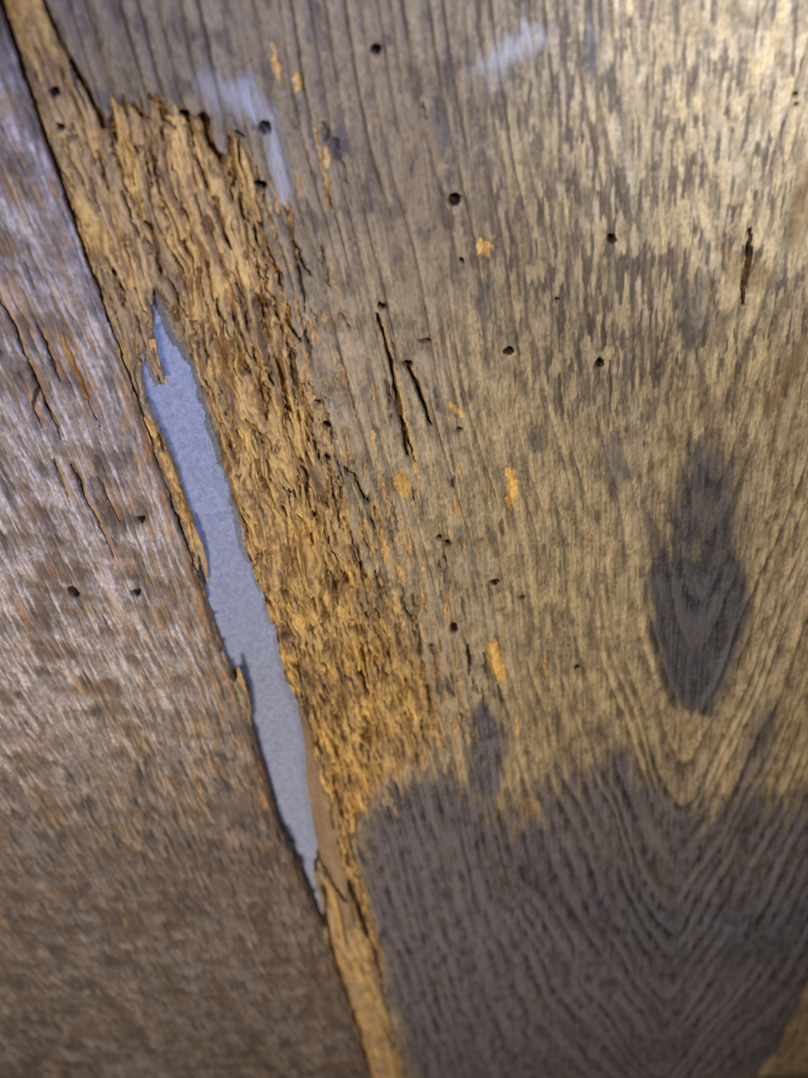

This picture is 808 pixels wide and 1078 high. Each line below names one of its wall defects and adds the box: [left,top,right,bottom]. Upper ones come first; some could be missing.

peeling [209,302,247,339]
peeling [290,483,315,532]
peeling [393,467,413,501]
crack [169,496,199,573]